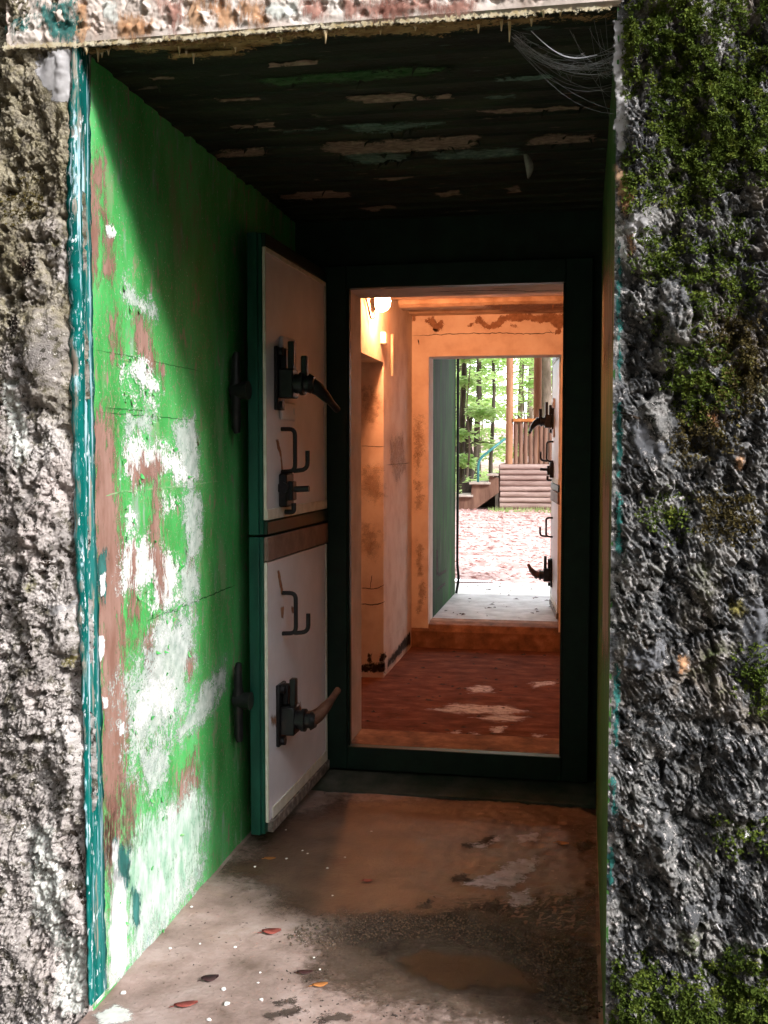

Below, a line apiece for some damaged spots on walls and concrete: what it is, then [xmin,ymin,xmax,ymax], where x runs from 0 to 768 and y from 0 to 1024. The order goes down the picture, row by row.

peeling [215,146,269,158]
peeling [230,59,596,193]
peeling [280,190,351,202]
rust [105,307,166,389]
spalling [412,316,444,332]
spalling [468,303,563,335]
rust [94,400,169,914]
peeling [100,352,229,979]
leakage [222,795,600,1024]